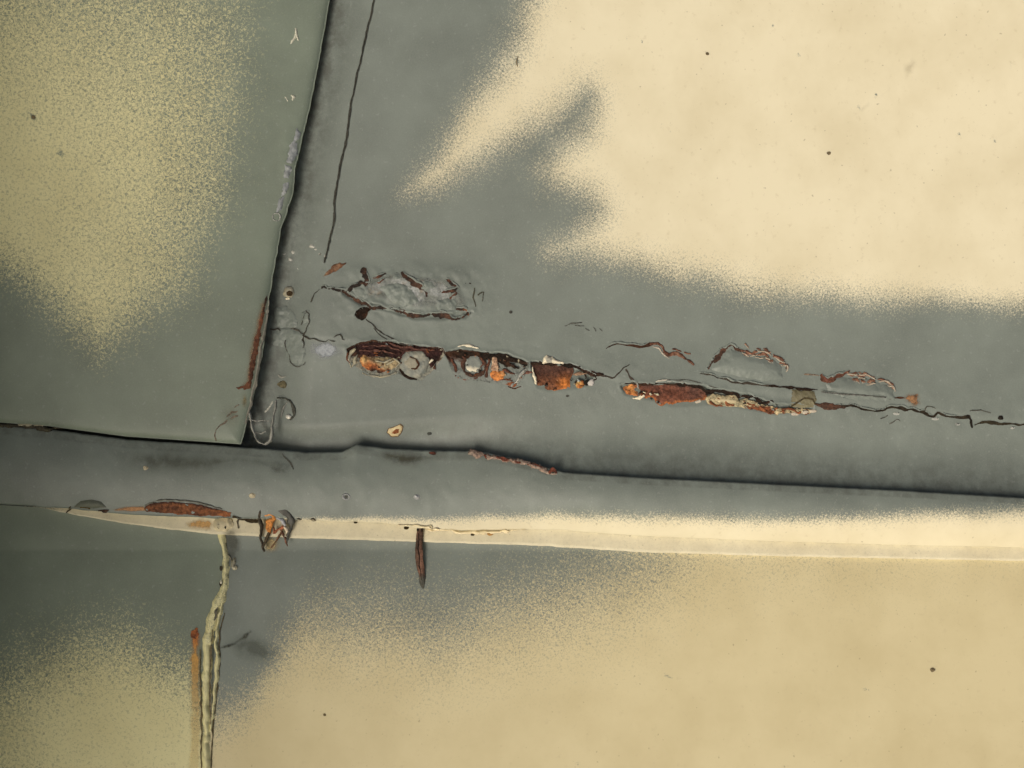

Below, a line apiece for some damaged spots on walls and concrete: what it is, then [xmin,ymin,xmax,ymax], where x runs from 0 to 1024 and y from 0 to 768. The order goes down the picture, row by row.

crack [324,0,374,263]
corrosion [236,296,270,424]
crack [605,341,1024,429]
corrosion [468,449,557,475]
corrosion [116,499,231,528]
peeling [258,510,296,552]
corrosion [415,528,425,589]
corrosion [190,628,199,697]